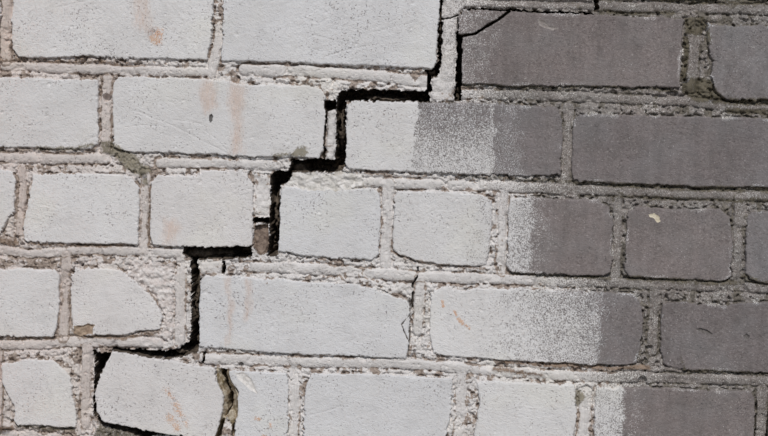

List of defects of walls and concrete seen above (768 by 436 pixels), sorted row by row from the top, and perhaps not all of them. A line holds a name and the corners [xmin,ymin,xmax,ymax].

crack [93,0,600,436]